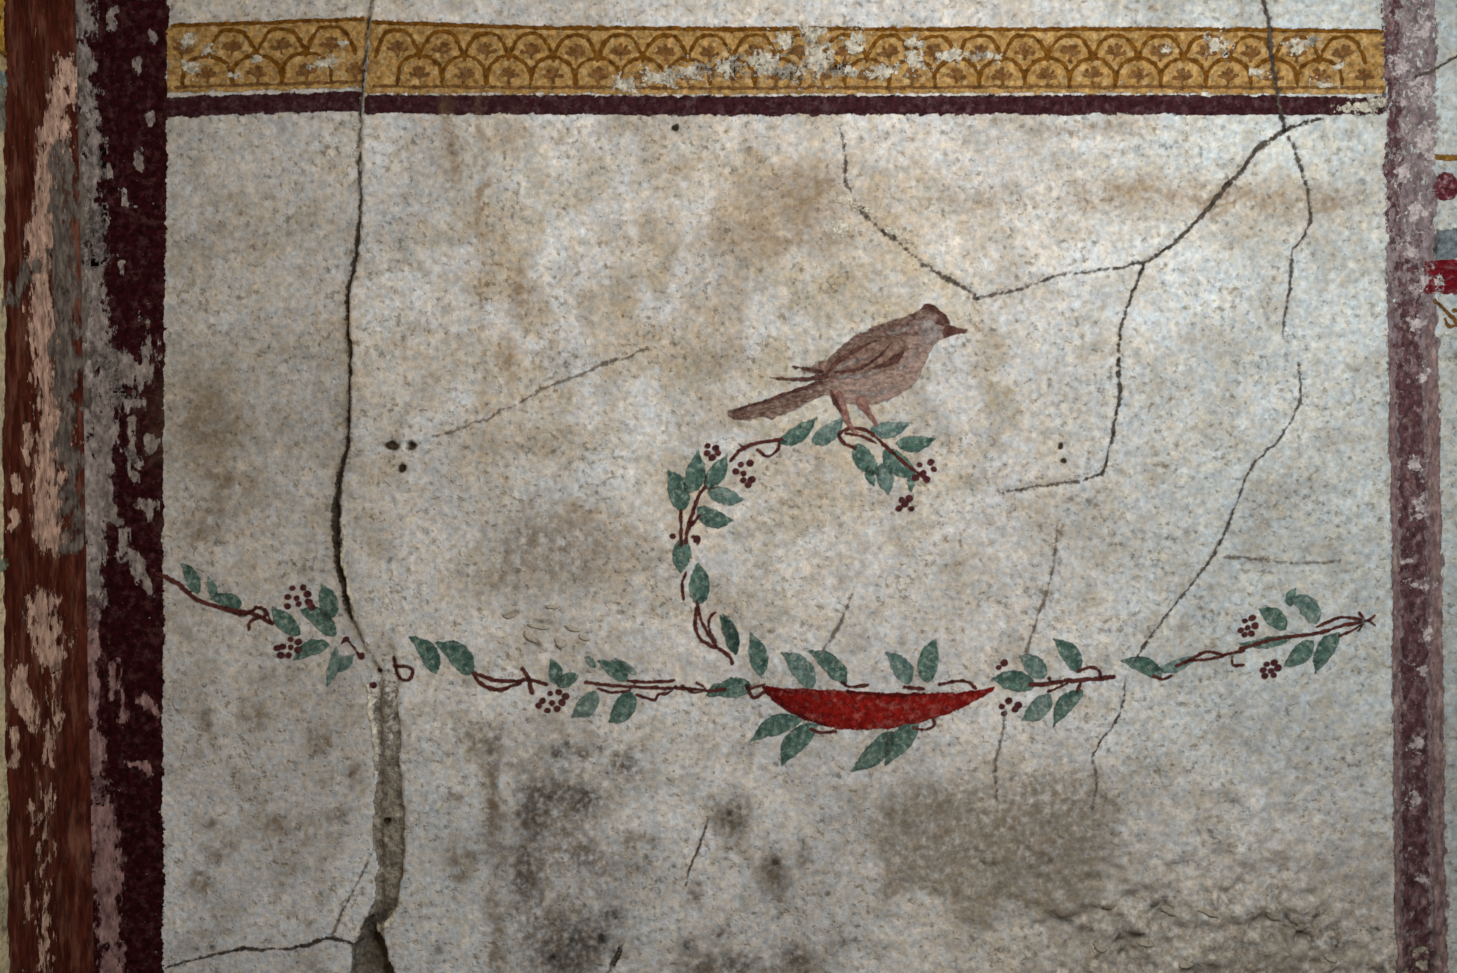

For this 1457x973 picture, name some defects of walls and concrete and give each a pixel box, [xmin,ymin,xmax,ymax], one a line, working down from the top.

peeling [611,17,1003,96]
peeling [1203,30,1235,58]
peeling [1279,34,1324,56]
crack [331,1,372,619]
crack [433,347,649,437]
crack [825,0,1340,810]
peeling [2,0,162,973]
crack [820,594,853,655]
crack [161,666,405,973]
damp [515,741,599,910]
damp [884,787,1104,925]
damp [548,909,618,972]